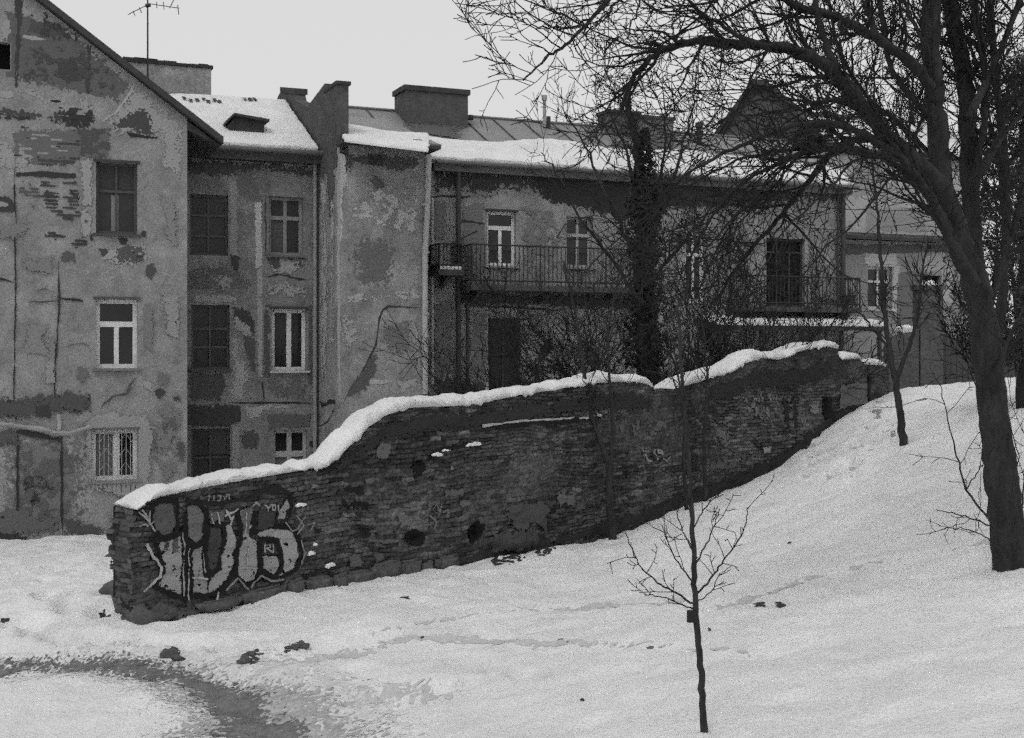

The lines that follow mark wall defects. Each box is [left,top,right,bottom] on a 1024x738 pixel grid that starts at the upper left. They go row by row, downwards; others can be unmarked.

flaking render [0,81,186,267]
flaking render [320,147,421,408]
crack [100,378,137,410]
spalling [393,515,426,546]
spalling [469,519,486,543]